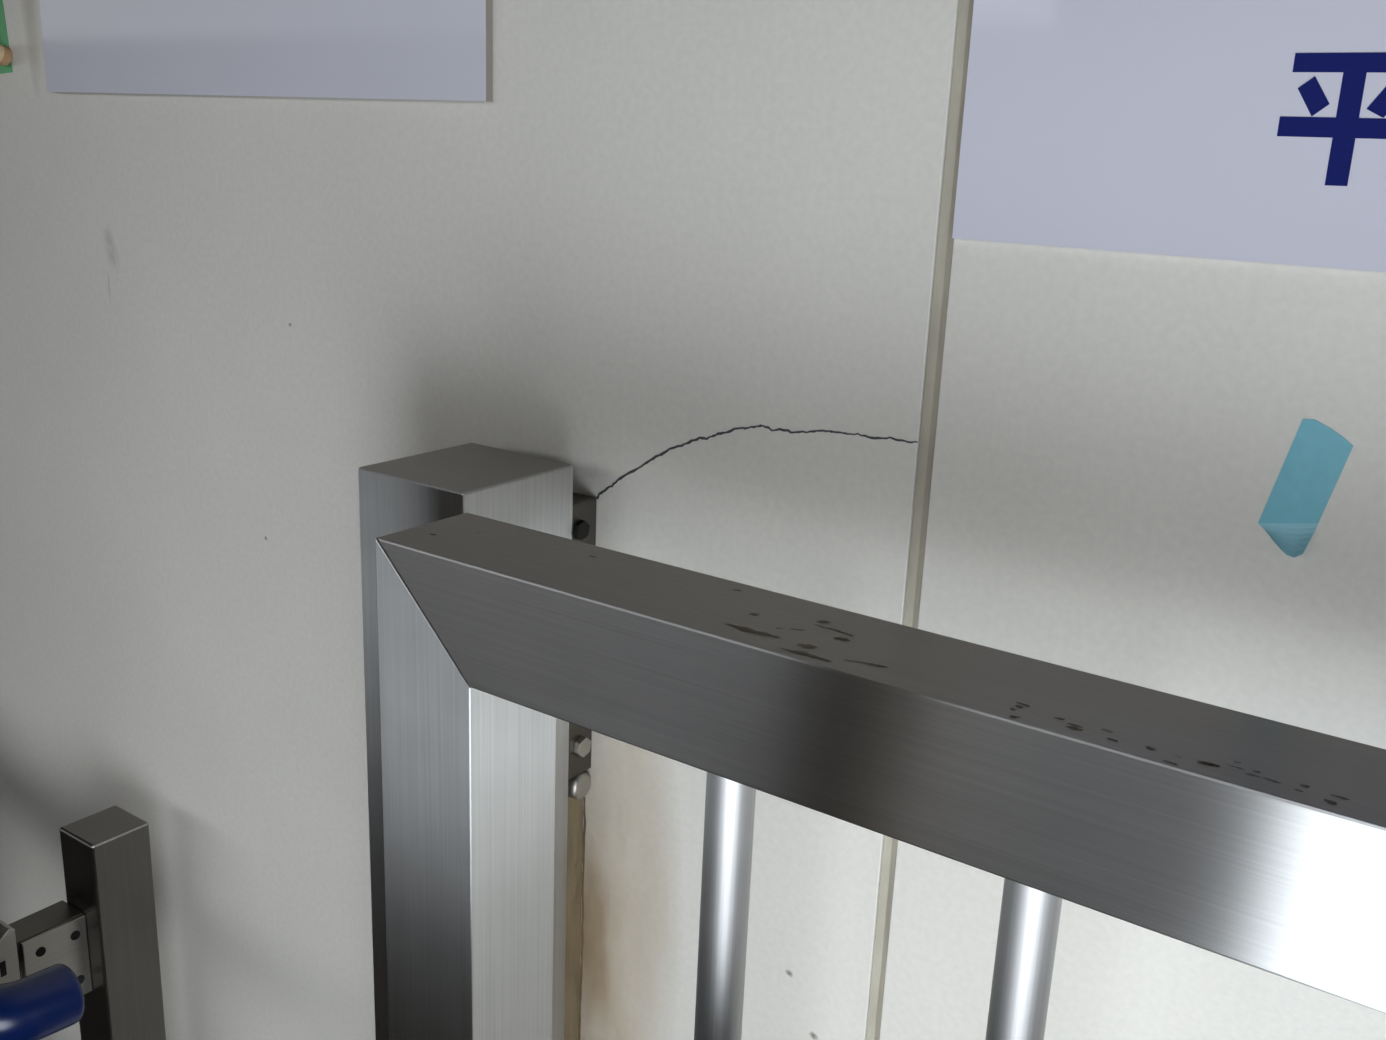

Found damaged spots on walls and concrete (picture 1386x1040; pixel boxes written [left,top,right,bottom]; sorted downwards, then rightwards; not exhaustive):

crack [596,424,918,499]